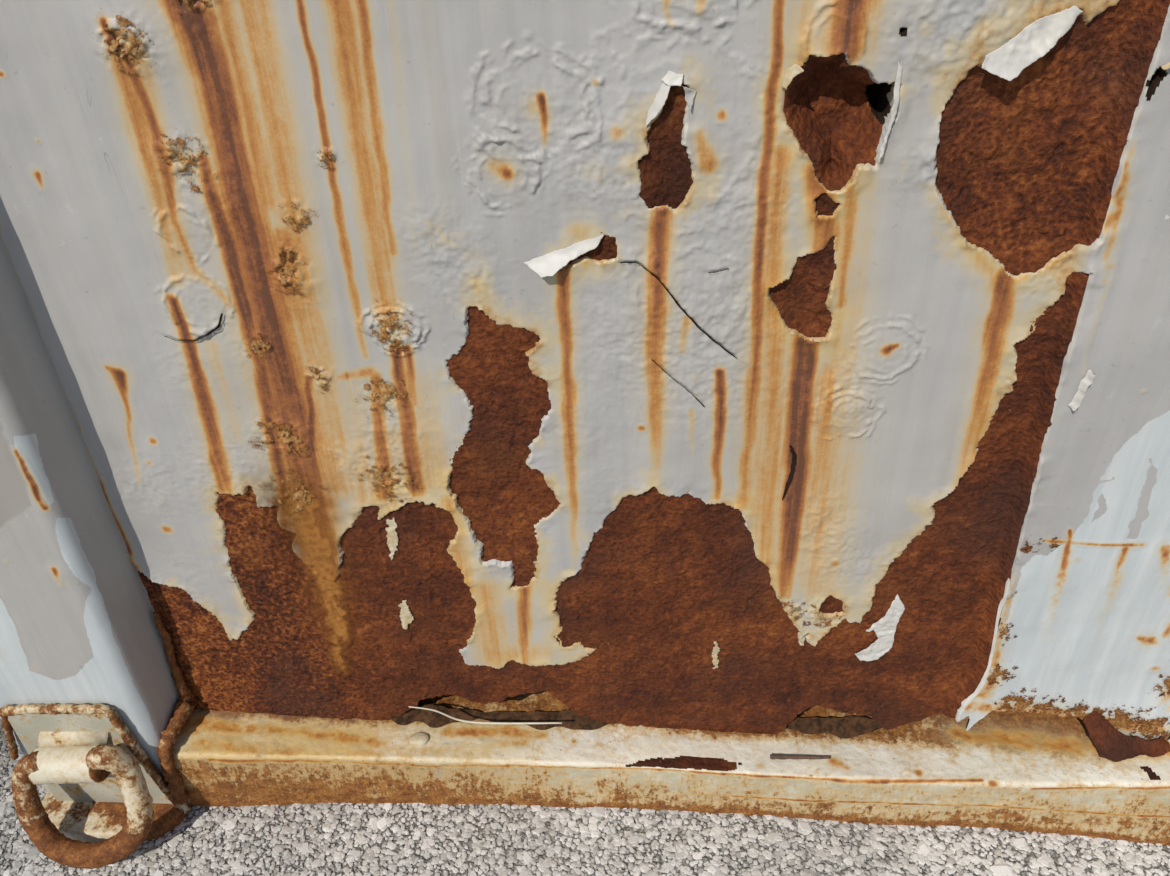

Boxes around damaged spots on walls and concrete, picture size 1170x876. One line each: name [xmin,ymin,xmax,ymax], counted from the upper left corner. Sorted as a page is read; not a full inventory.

corrosion [535,203,611,258]
peeling [524,235,604,278]
crack [619,262,736,358]
crack [651,359,705,407]
corrosion [90,352,163,490]
peeling [1011,406,1170,704]
corrosion [1020,524,1170,666]
corrosion [987,663,1016,685]
corrosion [999,695,1036,714]
corrosion [1108,707,1168,741]
corrosion [203,744,1005,791]
corrosion [1023,781,1170,794]